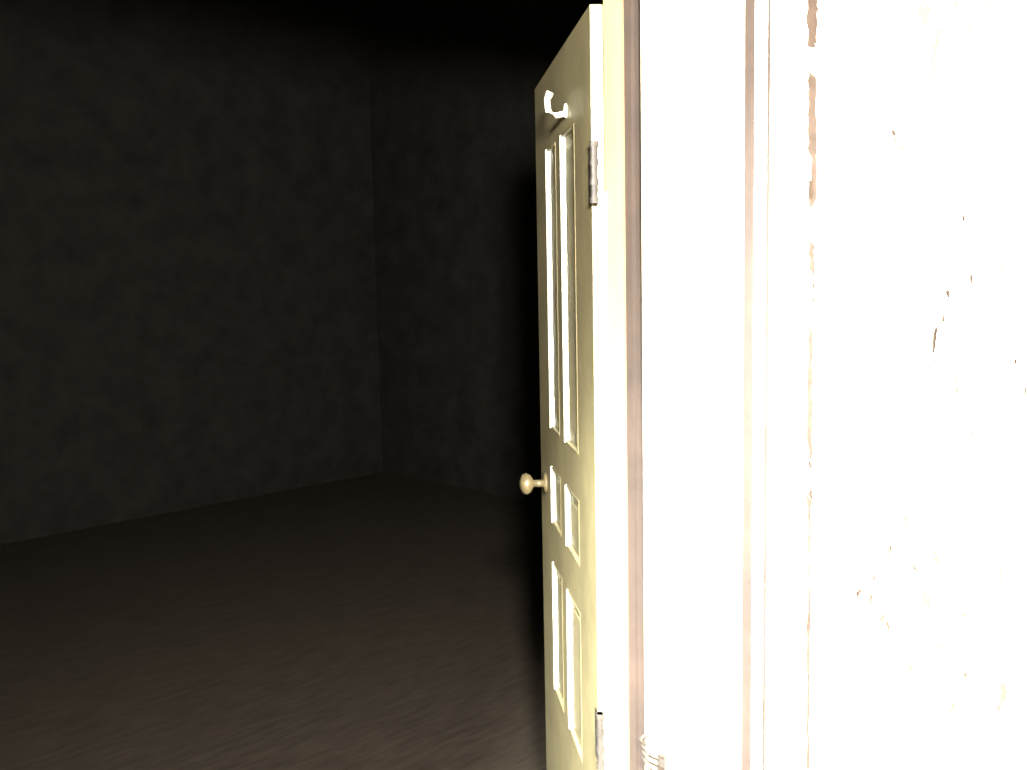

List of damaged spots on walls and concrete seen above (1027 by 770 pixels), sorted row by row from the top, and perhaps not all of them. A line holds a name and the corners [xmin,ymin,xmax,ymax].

peeling [802,0,845,208]
peeling [801,323,816,770]